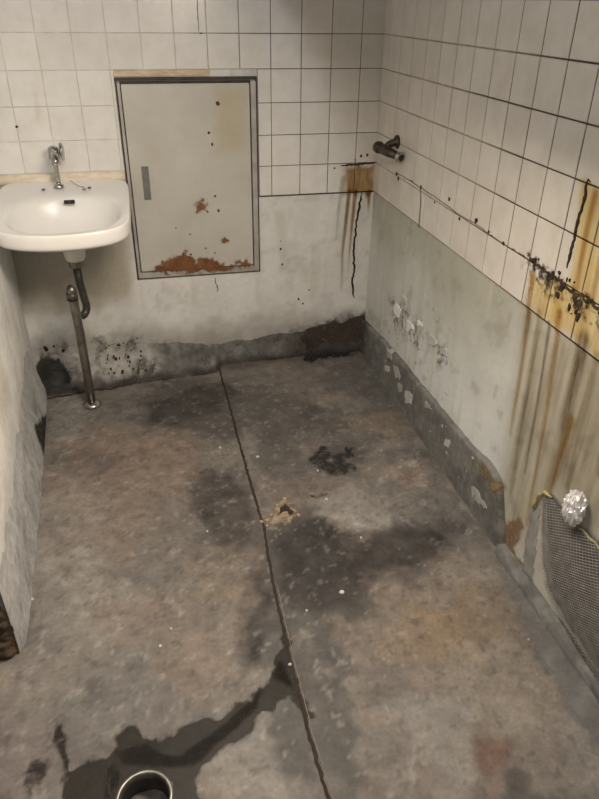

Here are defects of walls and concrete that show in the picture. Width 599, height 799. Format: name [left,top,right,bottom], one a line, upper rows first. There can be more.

rust [334,153,376,224]
rust [152,248,250,275]
crack [351,192,362,299]
crack [396,172,599,327]
leakage [36,345,82,395]
leakage [288,315,365,362]
peeling [379,289,448,404]
peeling [471,486,487,508]
rust [505,517,523,565]
crack [47,368,334,799]
spalling [0,606,19,661]
leakage [54,634,314,799]